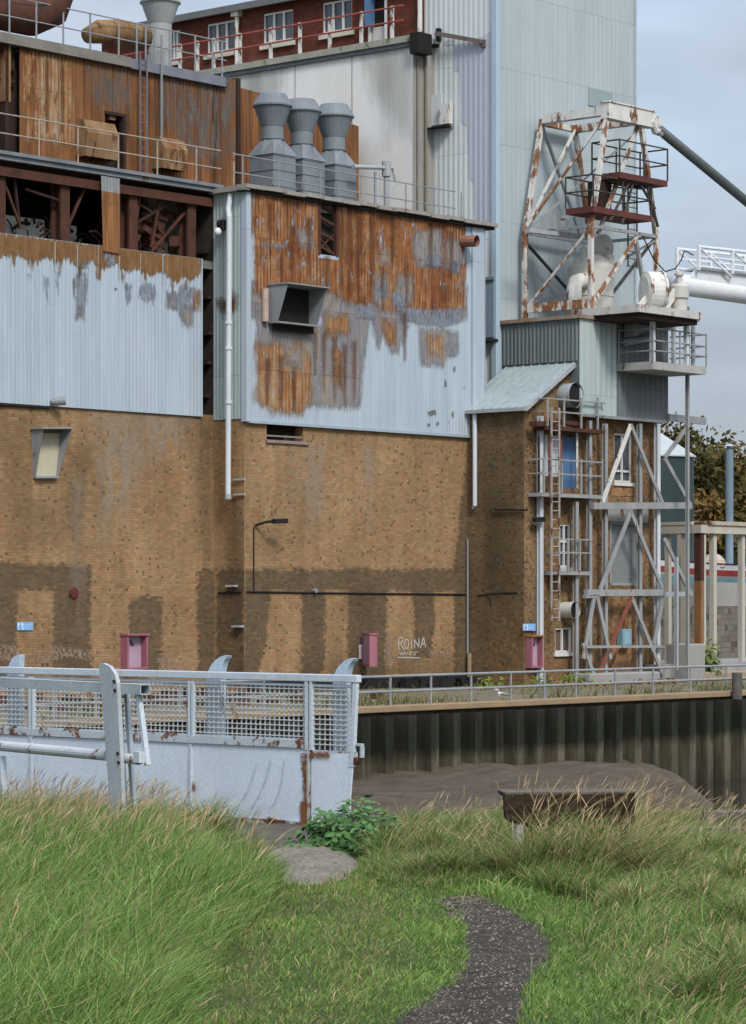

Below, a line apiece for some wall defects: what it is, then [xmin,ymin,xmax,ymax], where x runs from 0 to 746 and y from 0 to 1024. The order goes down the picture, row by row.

corrosion [22,50,78,147]
corrosion [0,233,202,290]
corrosion [251,193,468,324]
corrosion [255,341,312,415]
damp [0,564,91,677]
damp [129,468,468,686]
corrosion [299,752,329,822]